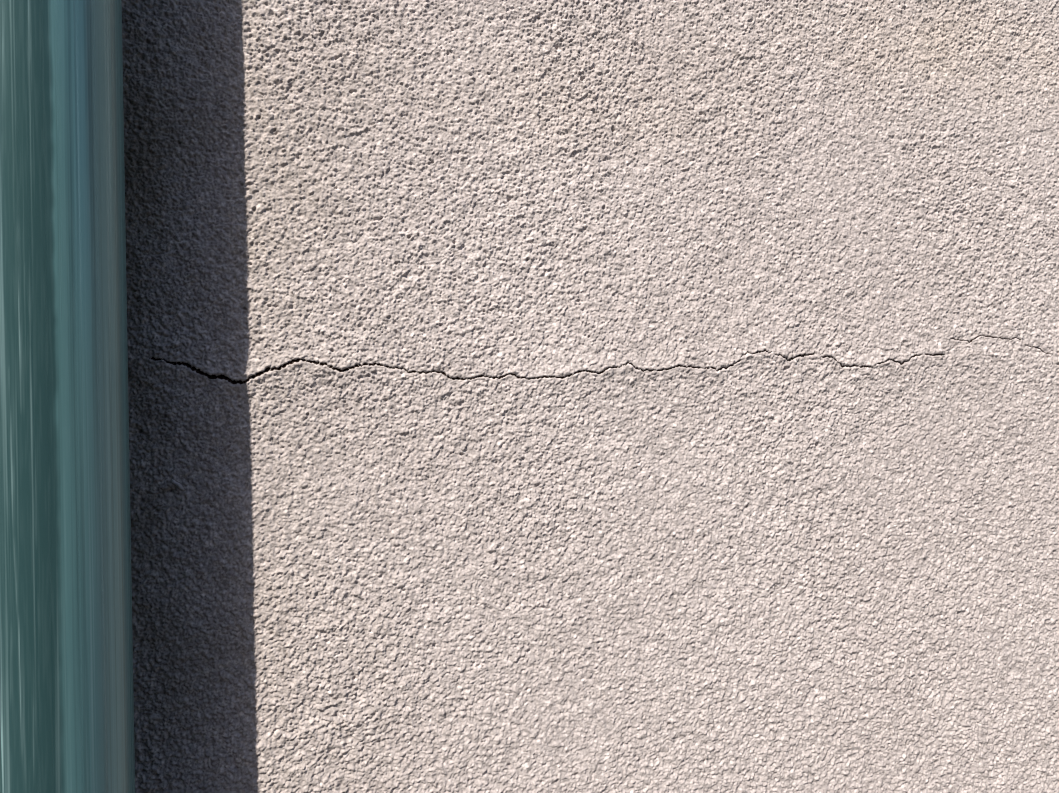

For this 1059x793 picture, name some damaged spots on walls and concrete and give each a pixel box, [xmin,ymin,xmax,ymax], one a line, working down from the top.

crack [149,335,1059,385]